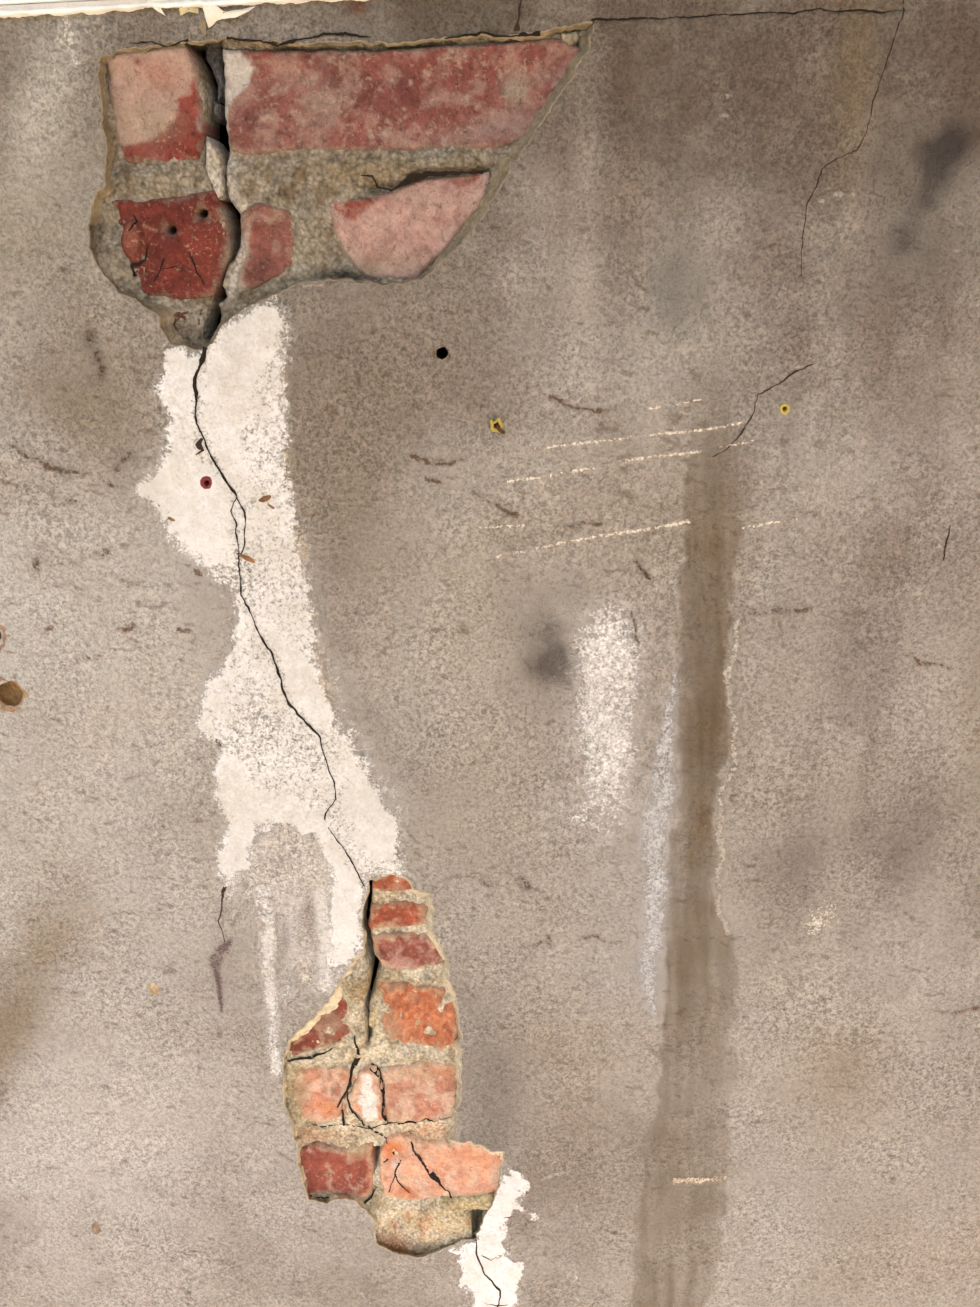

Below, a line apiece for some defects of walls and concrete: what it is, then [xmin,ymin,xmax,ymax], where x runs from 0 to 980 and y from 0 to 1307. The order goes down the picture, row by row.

flaking render [87,0,597,351]
crack [591,0,905,276]
crack [193,347,365,886]
leakage [640,675,676,1015]
leakage [677,491,742,980]
flaking render [282,873,506,1259]
crack [475,1239,506,1307]